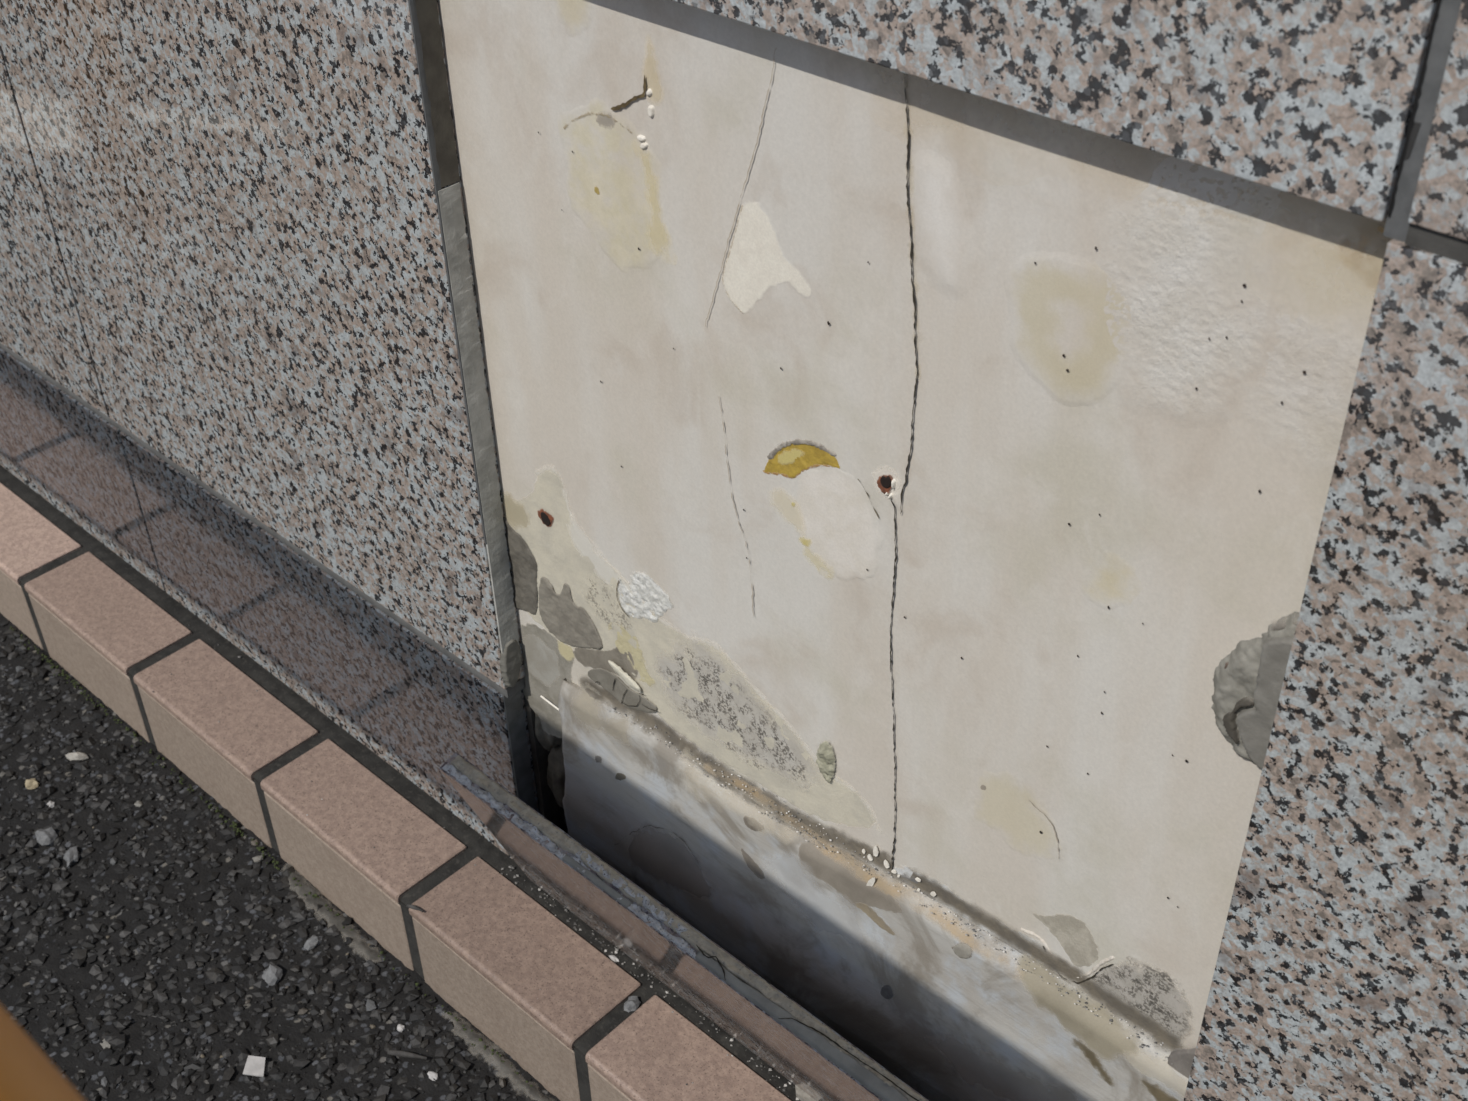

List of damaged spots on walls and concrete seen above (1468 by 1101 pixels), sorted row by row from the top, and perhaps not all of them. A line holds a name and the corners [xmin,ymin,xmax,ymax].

crack [705,49,776,326]
peeling [720,199,812,315]
crack [719,399,754,615]
spalling [763,439,840,478]
crack [858,73,918,876]
peeling [502,466,875,828]
spalling [741,849,764,879]
spalling [743,816,764,831]
spalling [856,845,937,935]